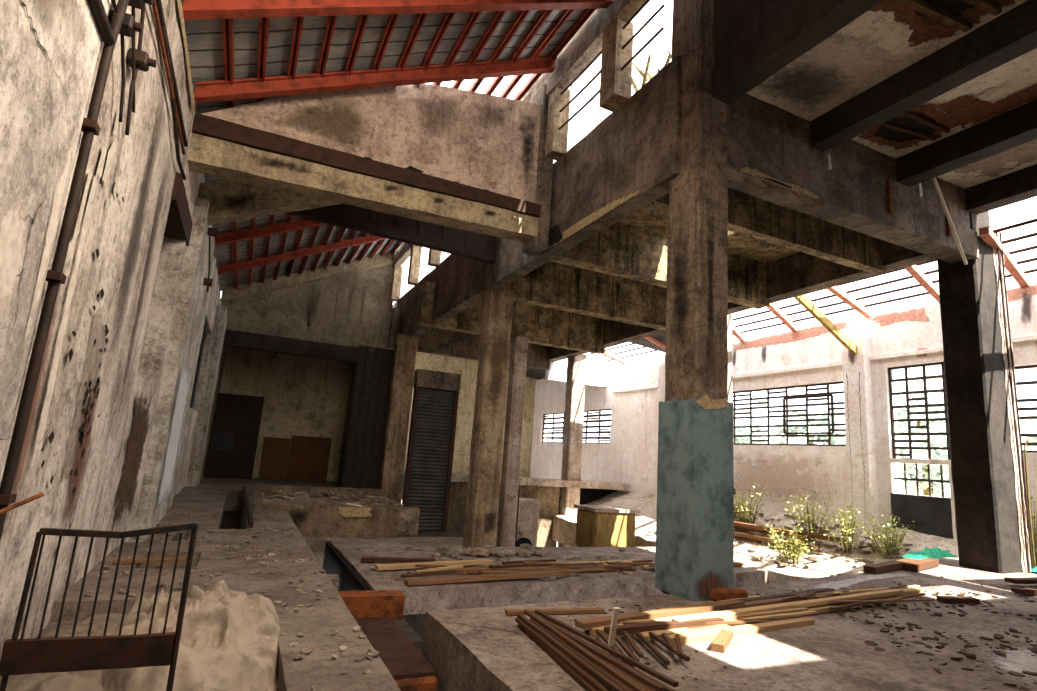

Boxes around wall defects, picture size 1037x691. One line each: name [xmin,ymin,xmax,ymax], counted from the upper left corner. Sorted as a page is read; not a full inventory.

crack [21,0,68,95]
leakage [759,34,888,111]
flaking render [941,88,1009,128]
flaking render [954,139,1037,177]
corrosion [64,393,97,521]
flaking render [112,390,152,531]